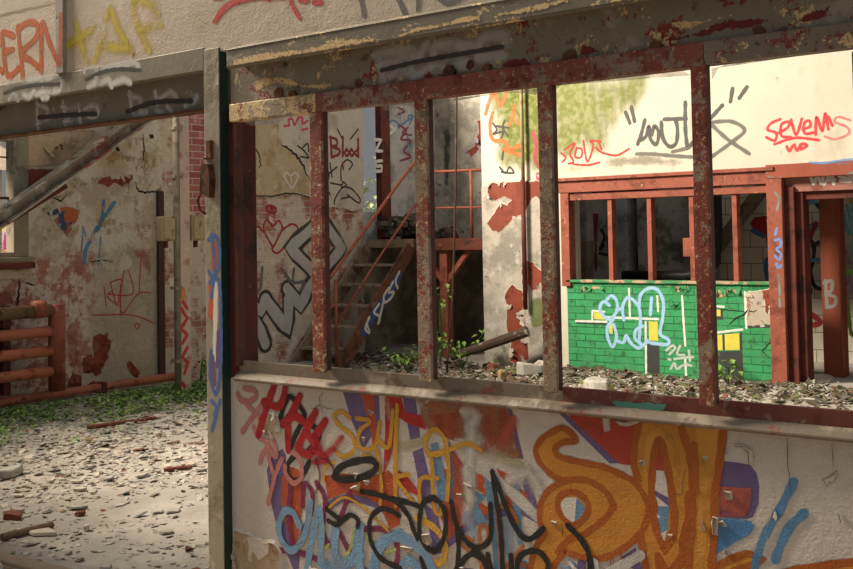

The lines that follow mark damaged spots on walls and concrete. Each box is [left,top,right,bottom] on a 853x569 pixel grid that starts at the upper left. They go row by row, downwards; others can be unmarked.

peeling [401,15,480,36]
peeling [498,0,568,16]
peeling [665,13,768,41]
peeling [800,6,830,22]
peeling [487,180,540,233]
peeling [504,260,542,365]
peeling [66,332,112,394]
peeling [127,361,140,378]
flaking render [231,528,283,569]